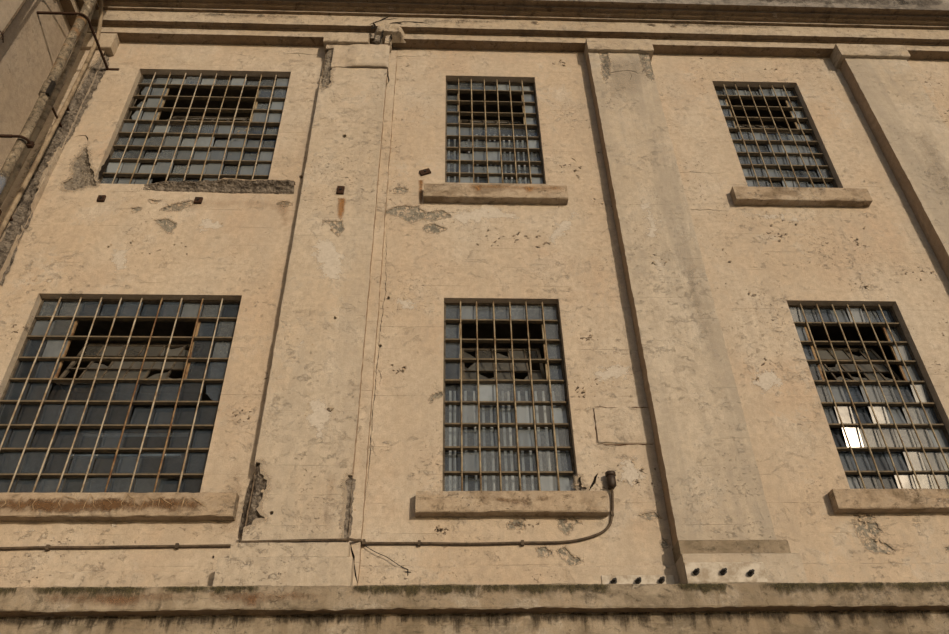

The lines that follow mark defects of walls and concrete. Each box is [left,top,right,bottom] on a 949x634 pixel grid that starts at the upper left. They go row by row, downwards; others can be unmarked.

spalling [319,47,334,90]
spalling [0,50,110,286]
peeling [386,187,451,234]
rust [0,498,197,513]
spalling [238,459,270,536]
spalling [340,473,356,542]
peeling [854,513,897,555]
water stain [47,587,139,597]
water stain [382,585,418,596]
water stain [436,585,506,594]
water stain [276,614,382,626]
water stain [532,612,649,625]